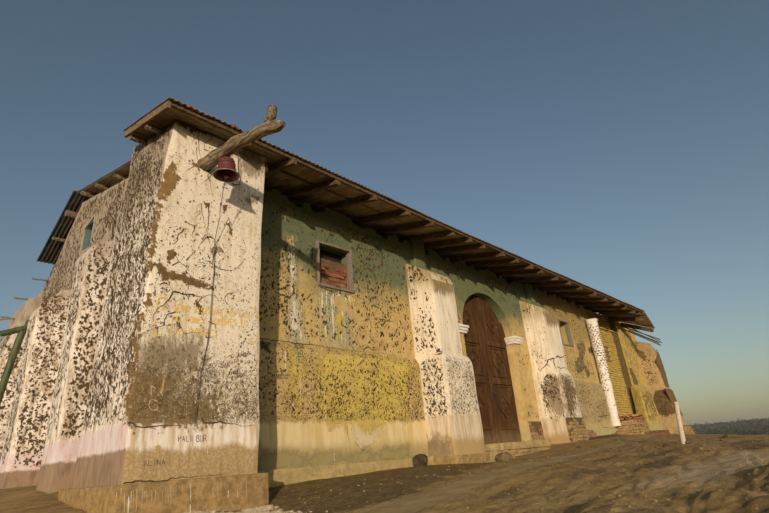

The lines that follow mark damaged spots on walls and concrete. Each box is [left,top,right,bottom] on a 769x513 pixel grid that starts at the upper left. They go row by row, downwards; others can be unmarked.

crack [144,135,244,338]
flaking render [0,121,477,468]
leakage [285,235,306,369]
leakage [318,287,354,352]